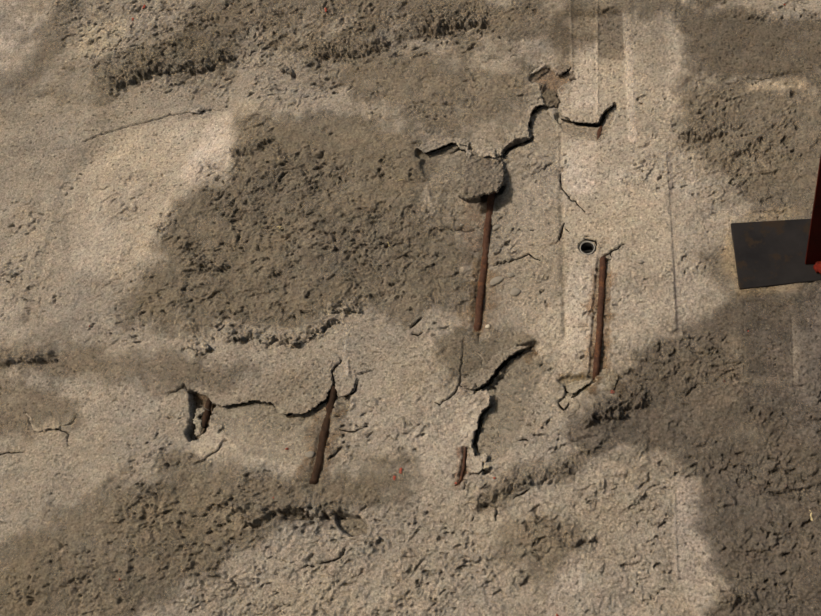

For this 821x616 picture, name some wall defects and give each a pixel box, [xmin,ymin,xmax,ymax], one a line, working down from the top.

spalling [416,63,614,223]
spalling [186,349,357,441]
crack [434,346,532,521]
spalling [454,345,541,499]
spalling [559,258,618,418]